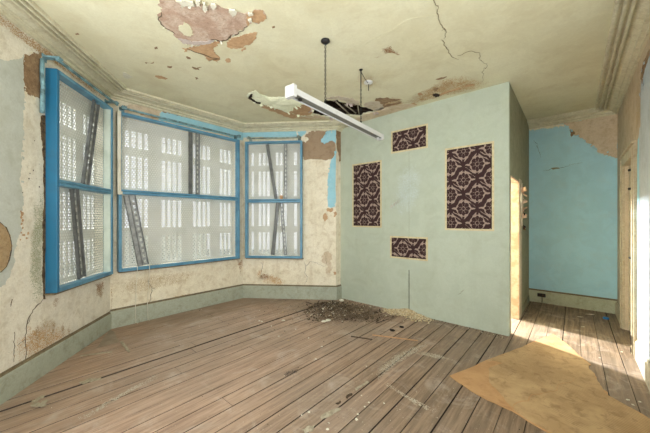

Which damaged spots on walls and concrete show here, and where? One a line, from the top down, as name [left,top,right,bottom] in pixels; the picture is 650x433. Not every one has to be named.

spalling [157,0,267,63]
crack [422,0,487,82]
peeling [0,52,42,287]
spalling [124,104,341,221]
spalling [324,97,419,115]
leakage [383,75,487,107]
peeling [530,114,617,159]
crack [14,298,44,359]